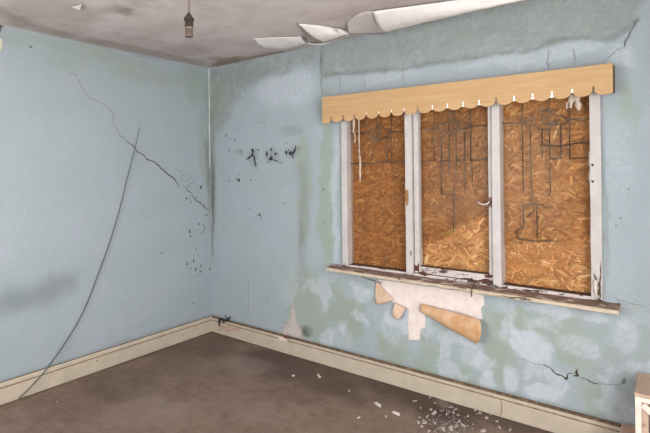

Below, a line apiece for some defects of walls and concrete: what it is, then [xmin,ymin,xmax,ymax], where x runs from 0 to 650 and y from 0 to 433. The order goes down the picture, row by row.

crack [604,19,639,61]
crack [67,72,214,230]
flaking render [278,305,302,342]
flaking render [362,277,484,340]
crack [520,358,622,385]